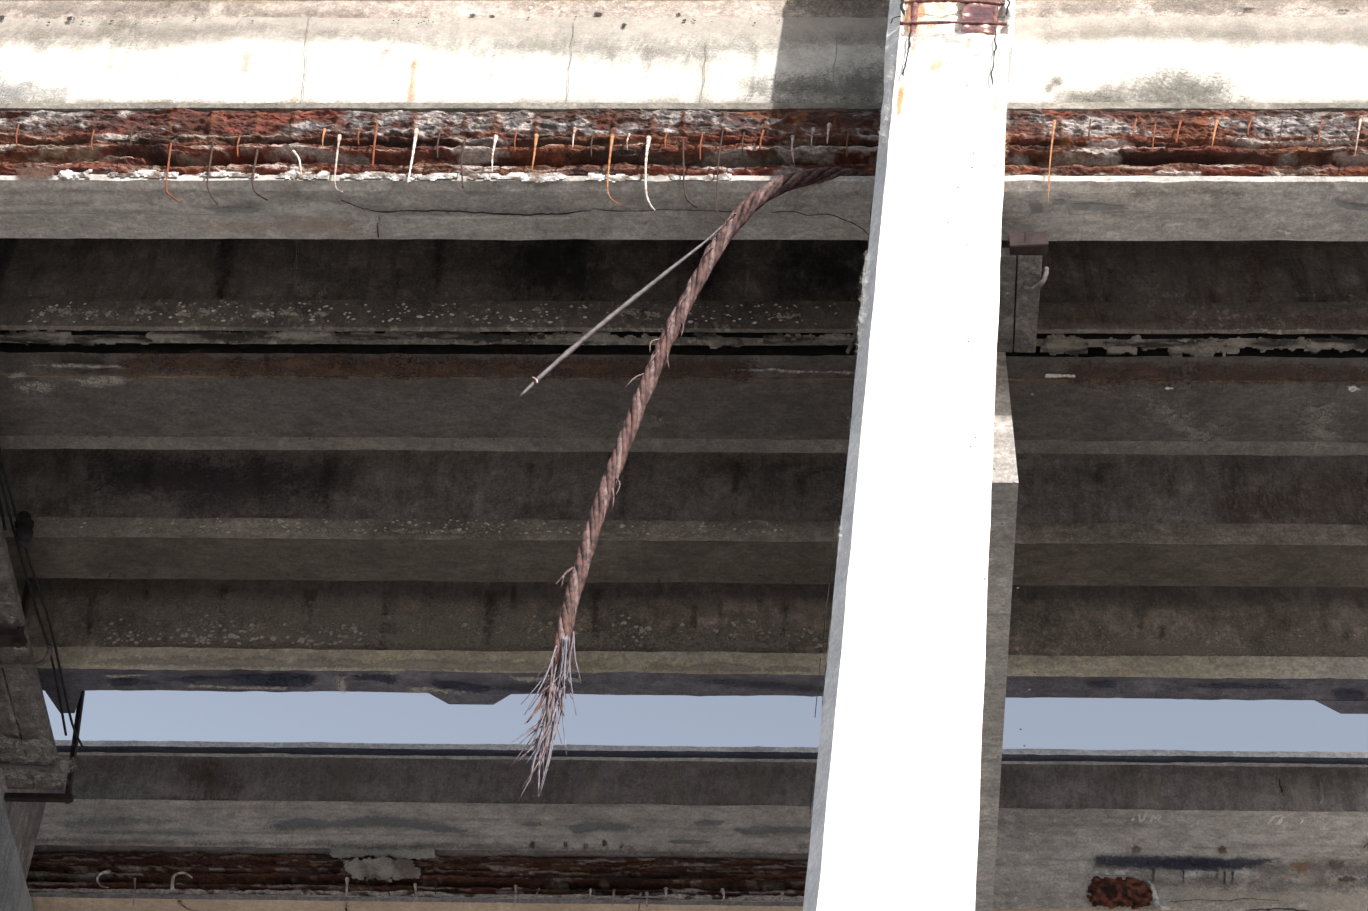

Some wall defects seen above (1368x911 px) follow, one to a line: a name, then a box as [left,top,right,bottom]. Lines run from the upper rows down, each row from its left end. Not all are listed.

crack [890,0,912,77]
crack [990,0,1011,86]
rust [897,83,906,114]
spalling [0,108,881,222]
spalling [994,108,1368,203]
peeling [0,686,76,788]
spalling [26,851,808,911]